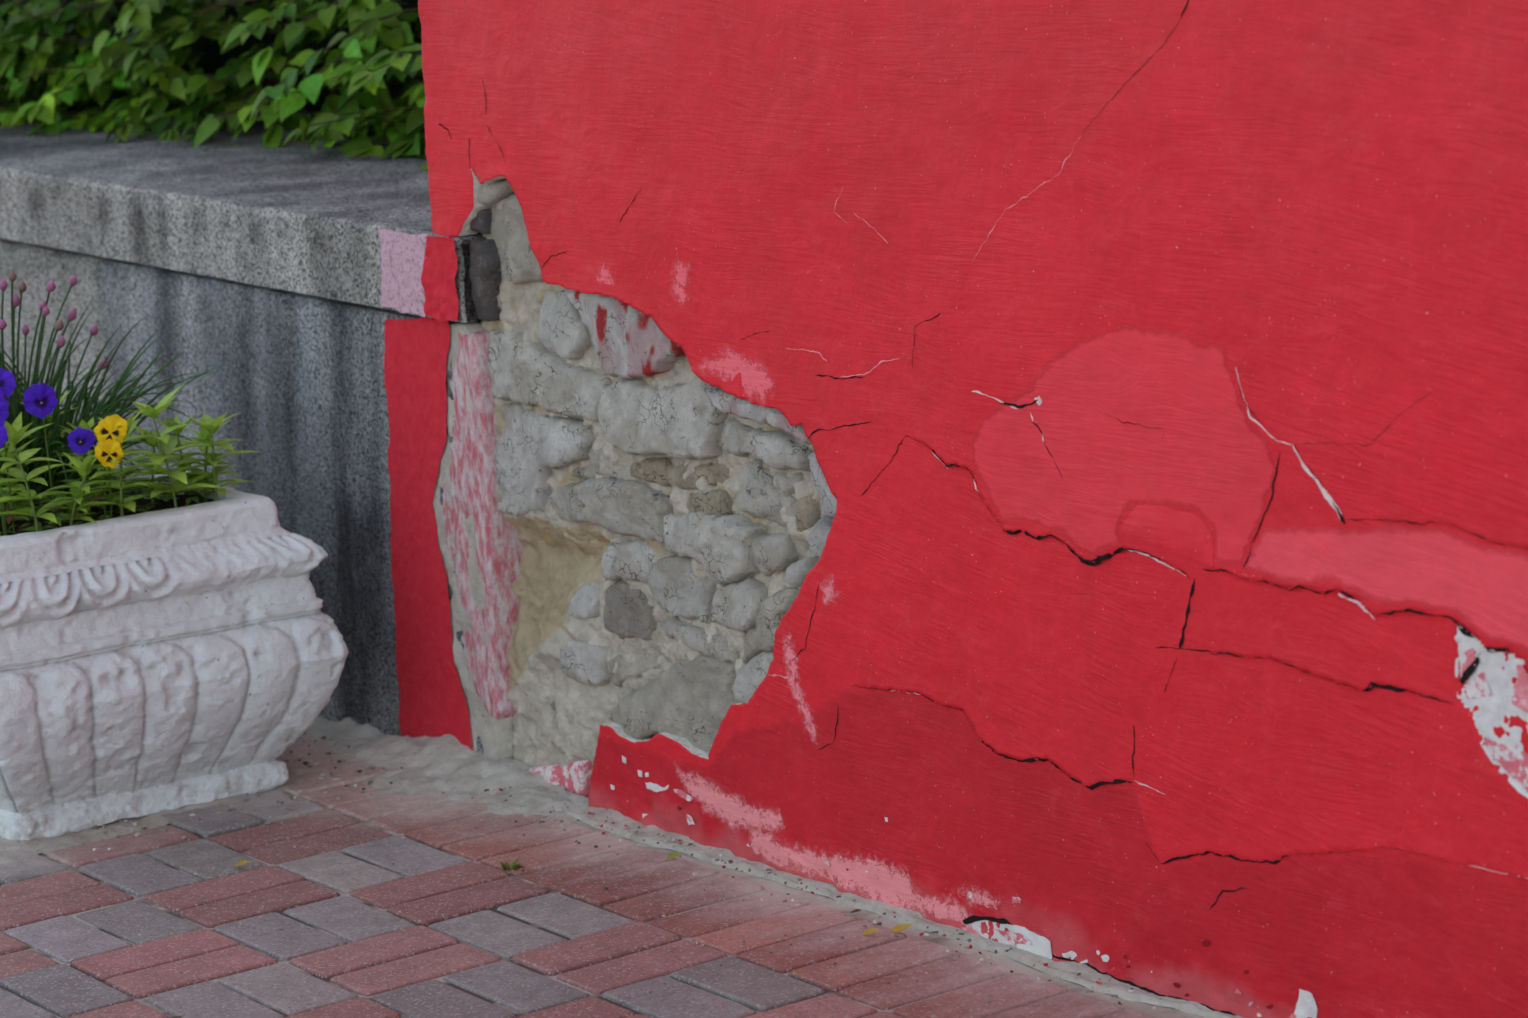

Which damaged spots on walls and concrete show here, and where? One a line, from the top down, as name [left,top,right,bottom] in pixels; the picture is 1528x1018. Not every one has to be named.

crack [973,0,1189,260]
crack [743,313,940,379]
spalling [432,180,837,797]
crack [806,367,1528,704]
peeling [622,756,695,825]
crack [771,581,1163,794]
crack [1146,844,1528,908]
peeling [1455,623,1528,798]
crack [1052,954,1236,1016]
peeling [1289,989,1317,1018]